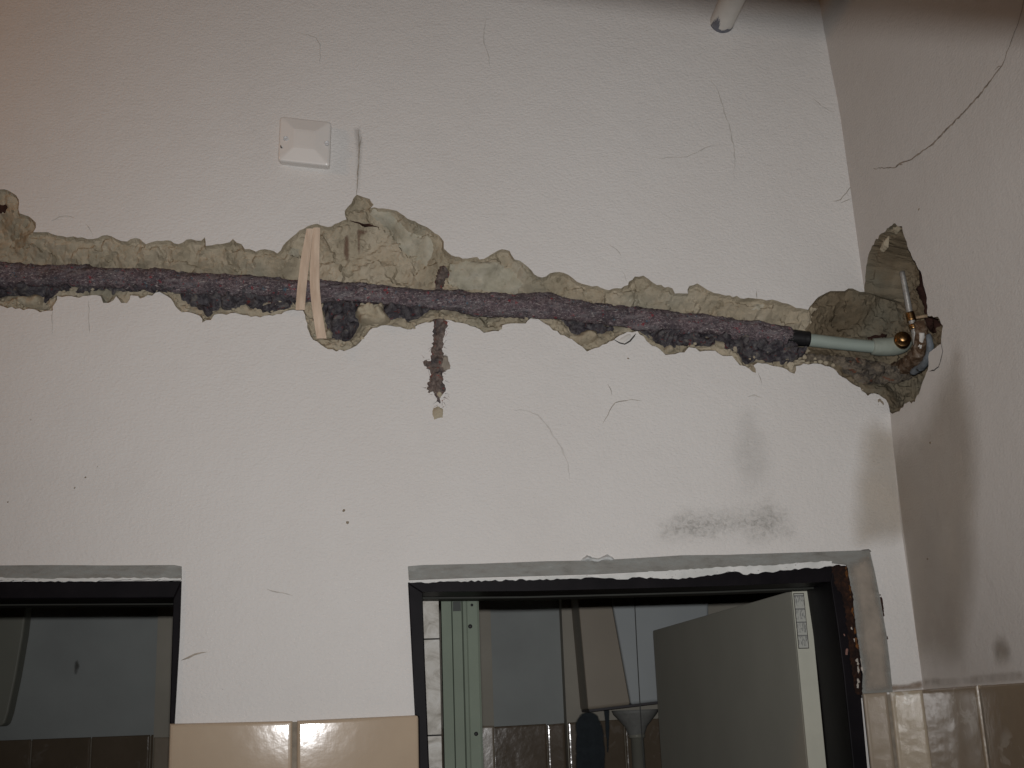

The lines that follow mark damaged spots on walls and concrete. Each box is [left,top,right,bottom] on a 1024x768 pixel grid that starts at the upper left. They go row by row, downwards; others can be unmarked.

crack [873,0,1024,169]
flaking render [0,189,943,419]
corrosion [832,565,864,698]